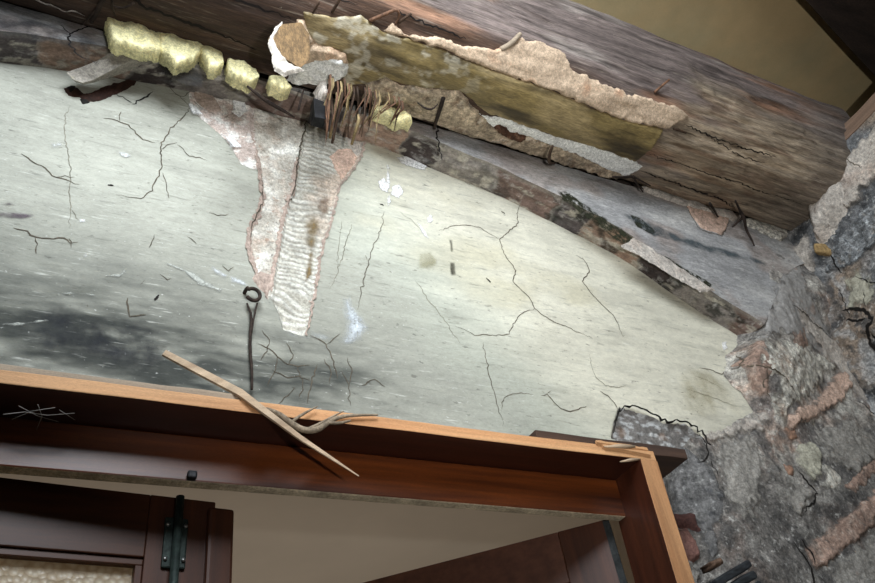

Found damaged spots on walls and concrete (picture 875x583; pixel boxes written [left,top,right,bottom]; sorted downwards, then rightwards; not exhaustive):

crack [15,106,78,252]
crack [104,87,205,199]
flaking render [189,91,366,336]
damp [560,192,633,243]
damp [631,215,740,257]
crack [688,126,776,163]
crack [260,332,384,405]
damp [348,304,362,338]
crack [417,208,622,417]
flaking render [611,122,875,583]
crack [691,355,803,407]
crack [831,255,875,351]